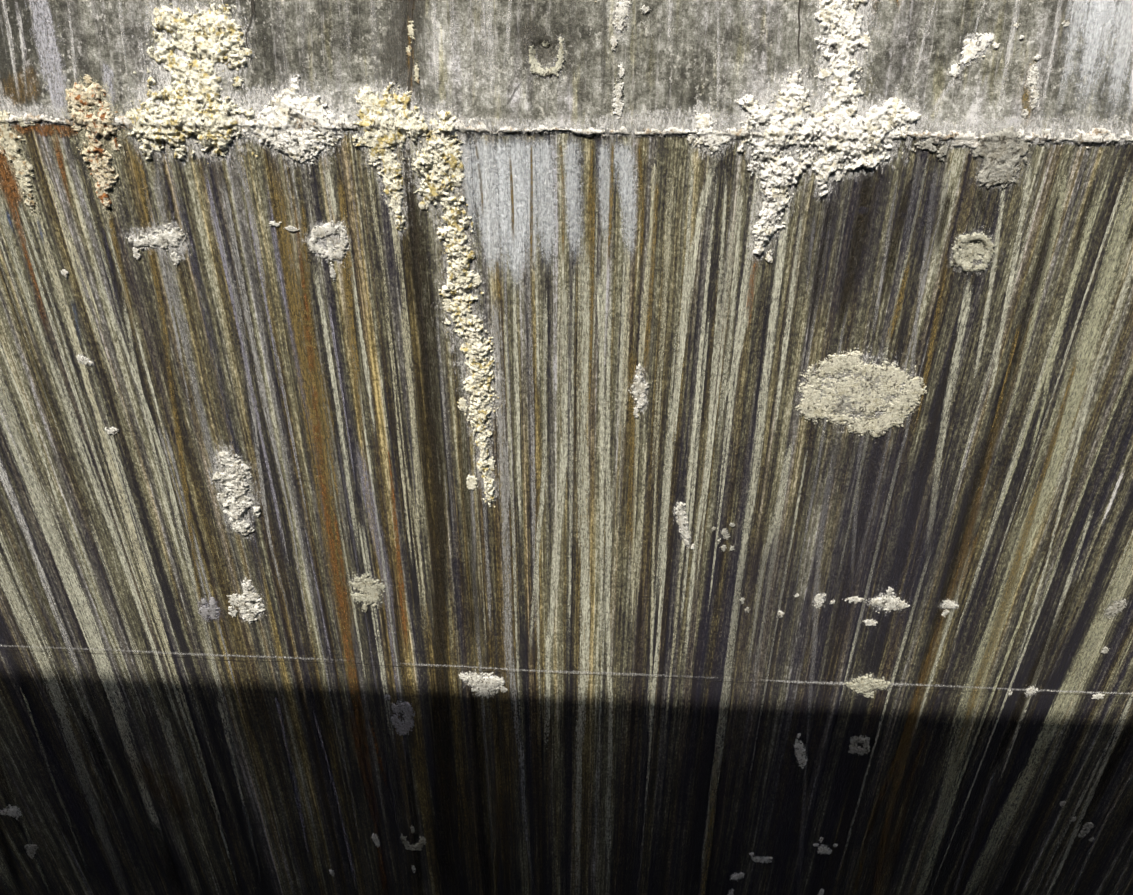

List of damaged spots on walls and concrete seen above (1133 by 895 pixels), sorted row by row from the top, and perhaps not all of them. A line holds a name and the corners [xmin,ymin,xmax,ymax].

corrosion [0,152,42,305]
corrosion [10,118,119,204]
leakage [42,164,120,399]
leakage [0,342,184,894]
leakage [76,167,211,608]
leakage [126,151,321,632]
leakage [544,144,613,883]
leakage [614,146,656,613]
leakage [648,165,715,760]
leakage [750,448,807,774]
leakage [775,220,802,420]
leakage [794,172,1133,895]